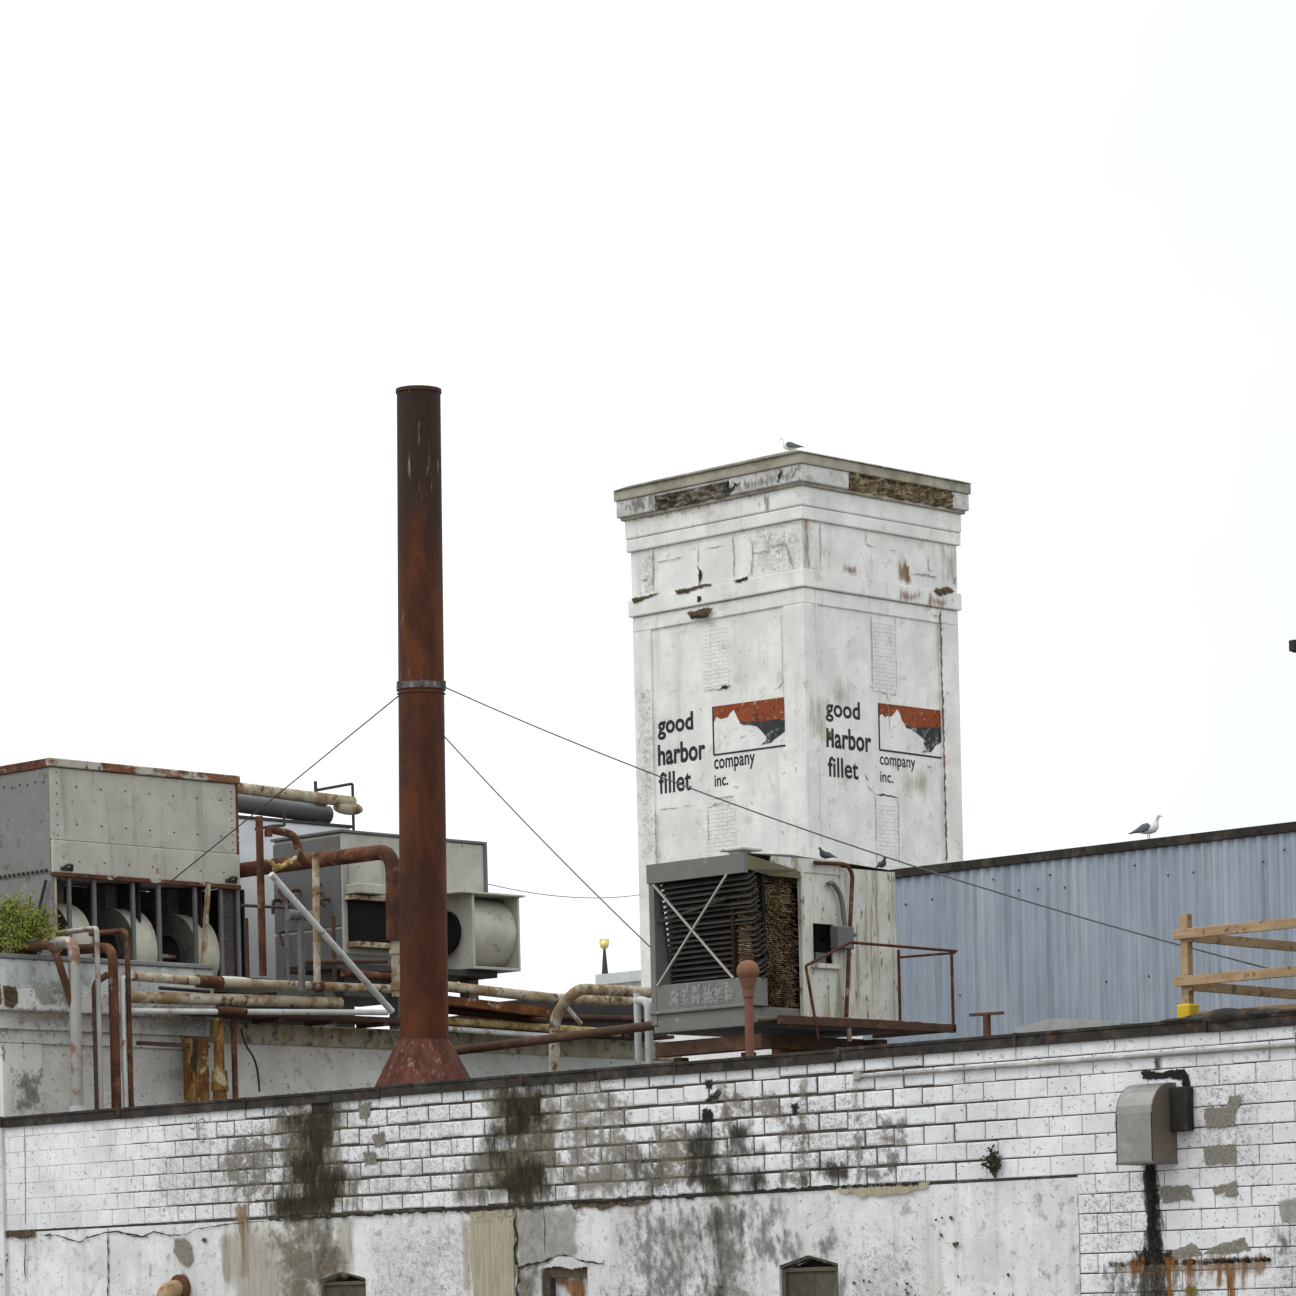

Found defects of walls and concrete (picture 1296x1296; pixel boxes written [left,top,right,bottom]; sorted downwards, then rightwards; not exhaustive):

spalling [654,481,730,511]
spalling [847,472,954,508]
spalling [901,586,955,606]
peeling [1204,1094,1241,1128]
peeling [1203,1144,1236,1166]
water stain [219,1102,360,1296]
water stain [456,1072,906,1296]
peeling [1212,1180,1238,1198]
water stain [1103,1263,1168,1296]
corrosion [1109,1254,1271,1296]